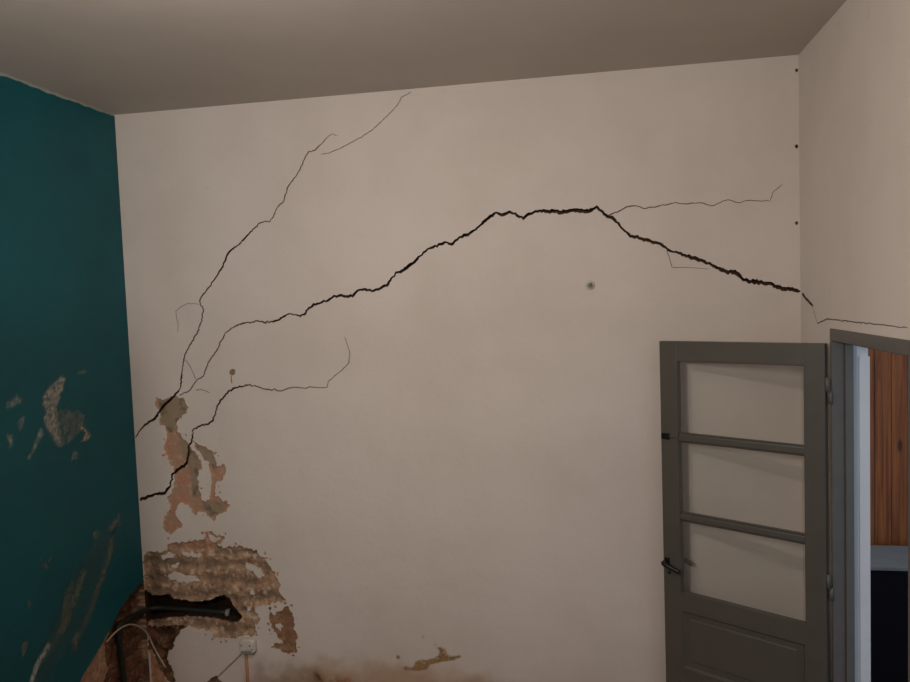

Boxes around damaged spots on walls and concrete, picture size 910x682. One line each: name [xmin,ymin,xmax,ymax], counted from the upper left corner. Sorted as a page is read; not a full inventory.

peeling [29,378,89,457]
flaking render [80,396,300,682]
damp [405,647,460,670]
crack [135,92,907,501]